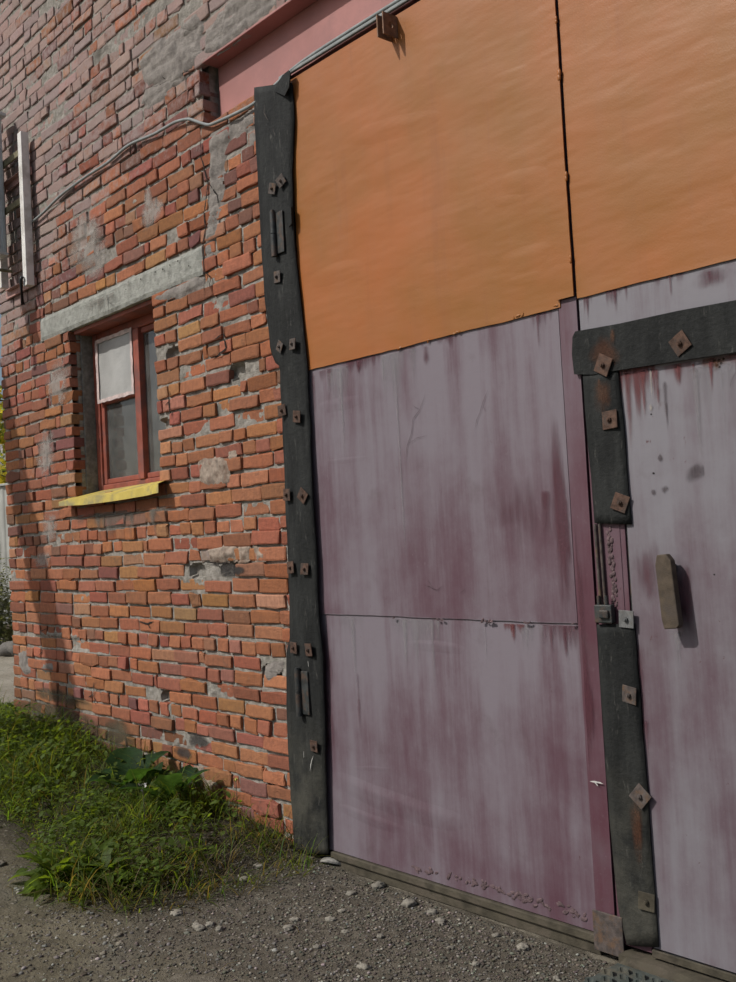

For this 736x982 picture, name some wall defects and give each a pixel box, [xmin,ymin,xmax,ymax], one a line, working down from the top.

spalling [198,450,237,486]